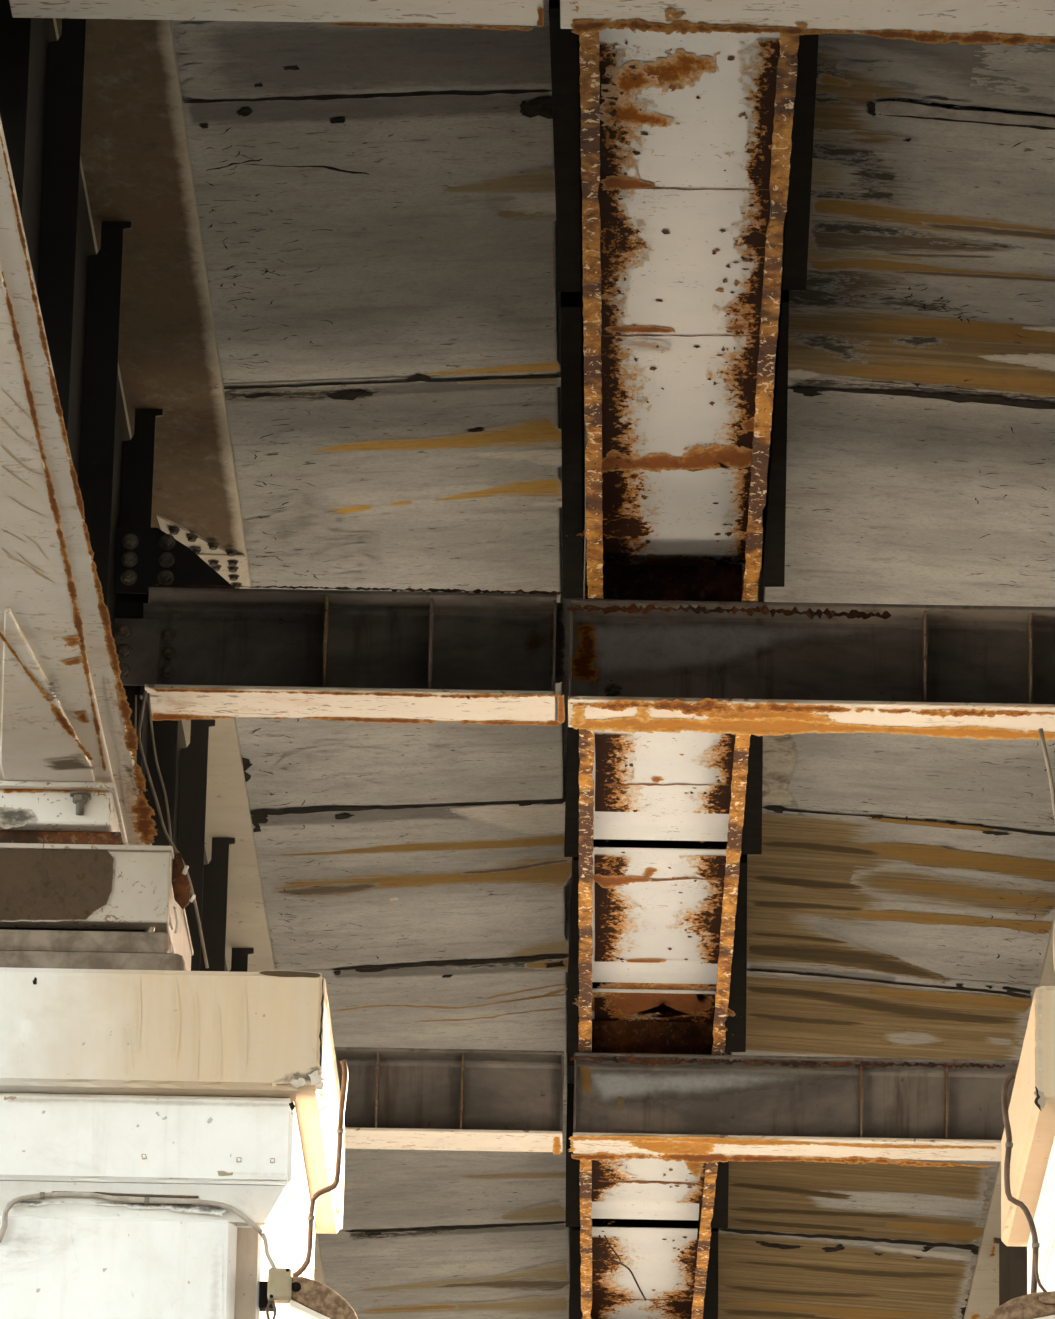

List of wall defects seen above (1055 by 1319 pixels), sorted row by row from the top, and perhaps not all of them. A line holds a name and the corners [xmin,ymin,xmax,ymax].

corrosion [441,167,556,222]
corrosion [570,2,1055,602]
corrosion [424,360,561,384]
corrosion [0,135,158,845]
corrosion [324,500,413,516]
corrosion [311,416,562,508]
corrosion [150,603,1055,1095]
damp [747,968,822,978]
corrosion [356,1136,998,1319]
damp [863,1244,972,1261]